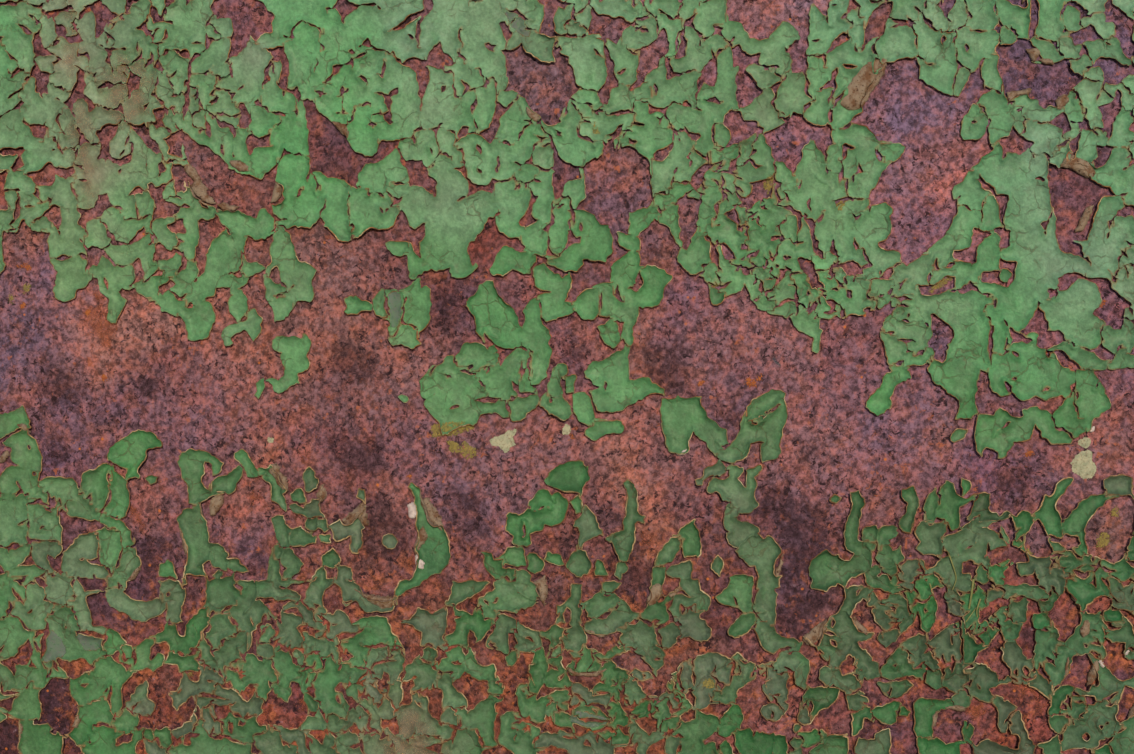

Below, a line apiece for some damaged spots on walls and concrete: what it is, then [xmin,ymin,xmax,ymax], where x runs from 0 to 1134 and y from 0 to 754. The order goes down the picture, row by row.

rust [649,105,679,161]
rust [0,147,75,210]
rust [44,205,62,231]
rust [77,103,284,276]
rust [468,179,501,195]
rust [519,195,538,228]
peeling [0,0,1134,459]
rust [543,124,654,304]
rust [675,192,702,250]
rust [691,163,717,192]
rust [0,210,1134,754]
peeling [0,389,1134,754]